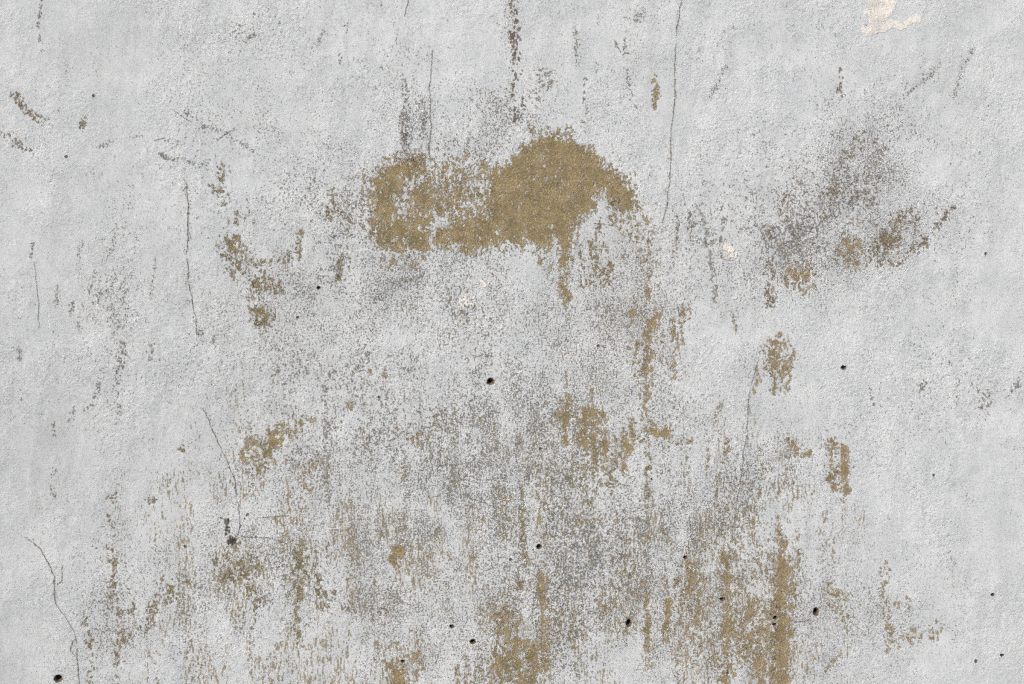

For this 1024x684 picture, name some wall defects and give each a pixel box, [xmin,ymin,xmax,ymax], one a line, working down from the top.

crack [662,0,682,222]
peeling [208,162,304,332]
peeling [238,414,313,477]
peeling [300,450,323,493]
peeling [325,123,693,532]
peeling [752,331,797,395]
peeling [823,436,853,503]
crack [27,538,80,684]
peeling [447,487,552,684]
peeling [637,515,802,684]